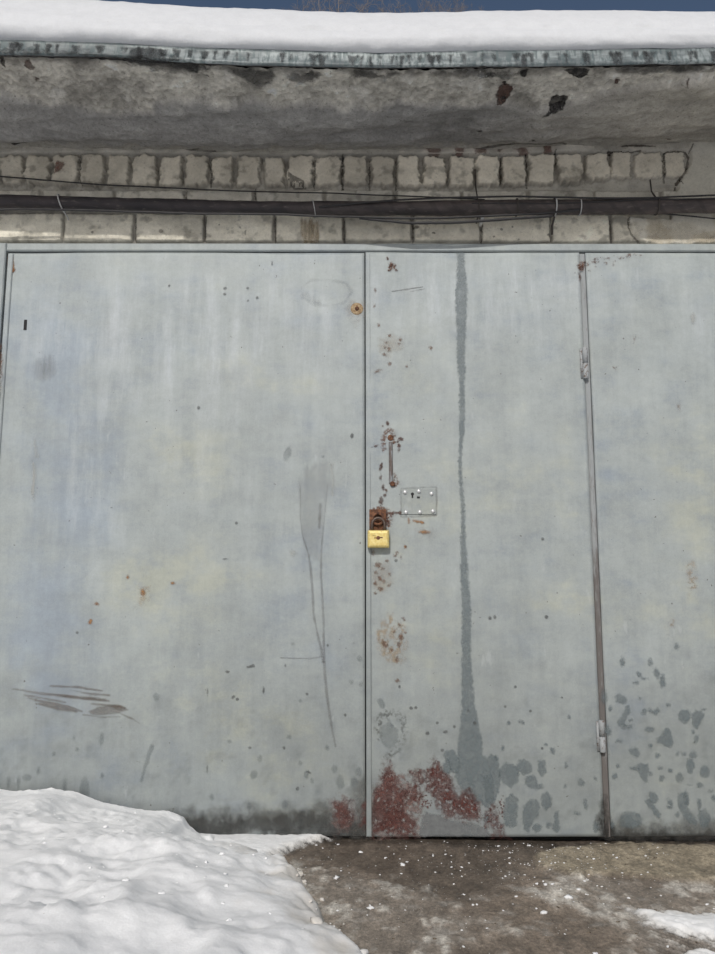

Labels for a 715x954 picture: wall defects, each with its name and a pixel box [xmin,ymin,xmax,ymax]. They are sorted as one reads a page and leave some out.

spalling [565,68,589,78]
spalling [496,81,513,105]
spalling [543,95,568,117]
crack [596,145,693,191]
rust [373,476,427,533]
damp [444,252,559,832]
damp [679,709,705,734]
damp [646,728,709,787]
damp [646,793,710,827]